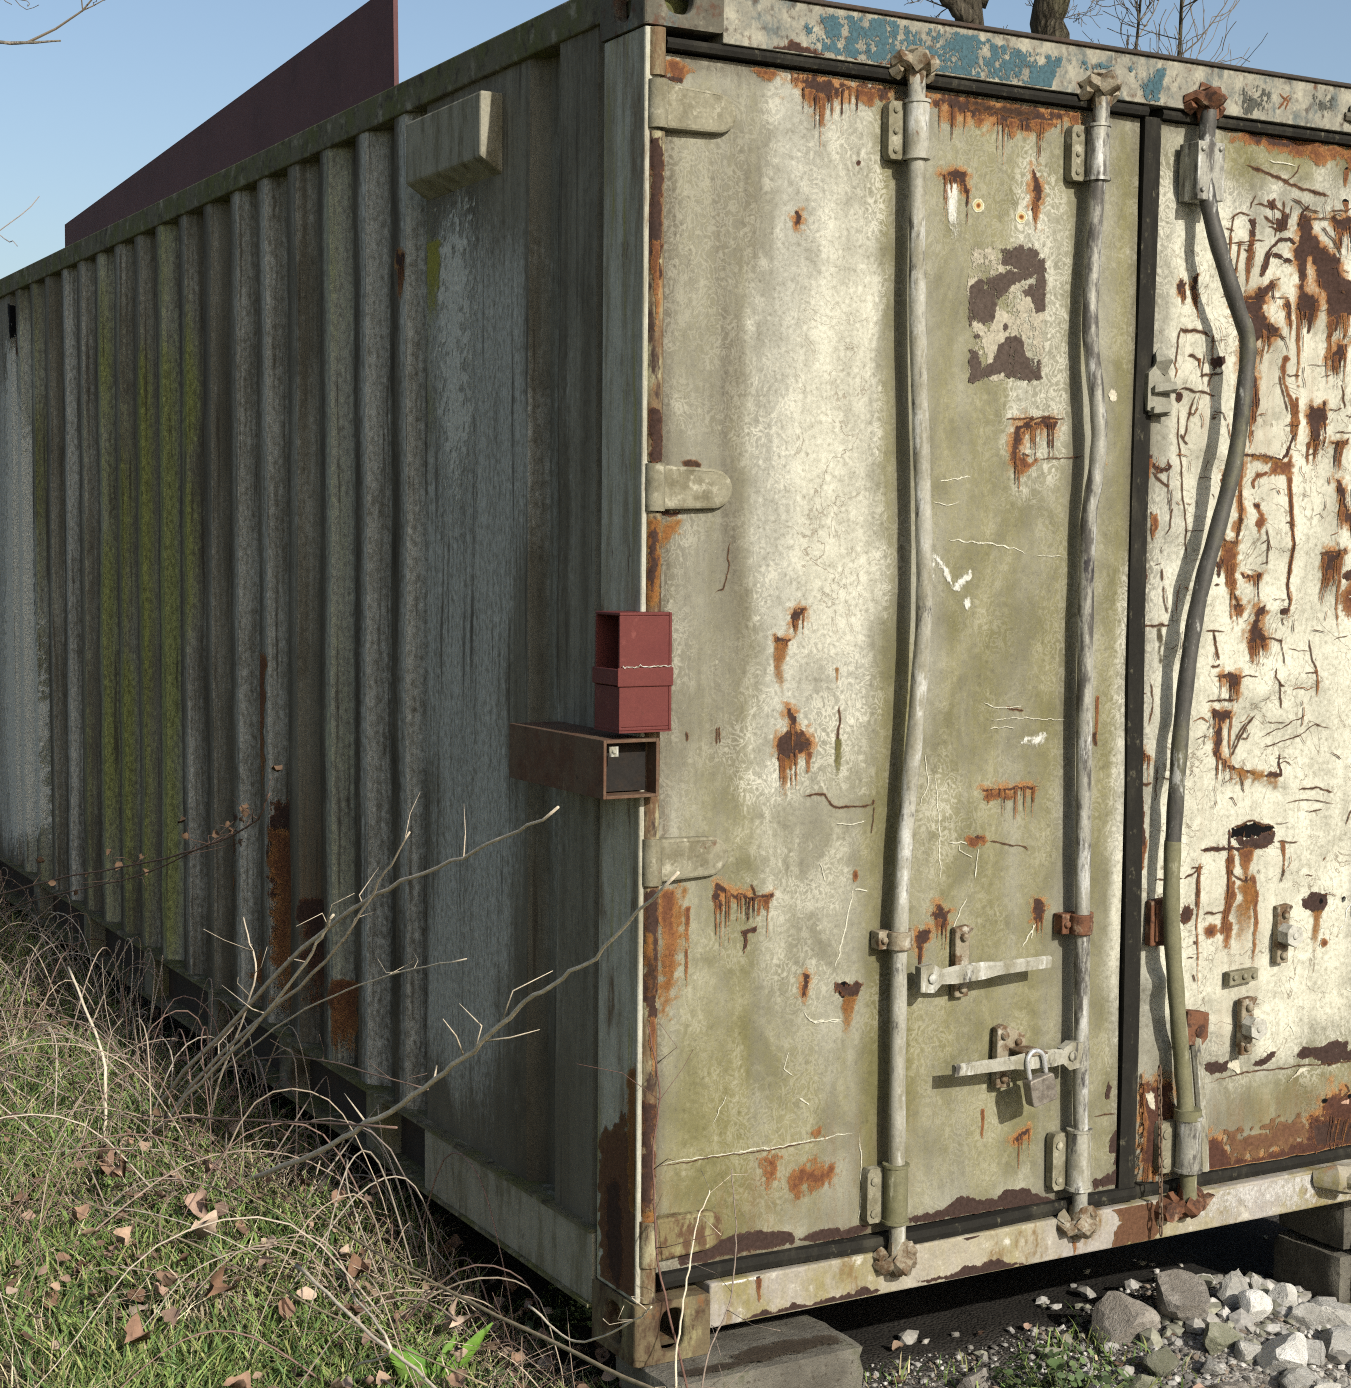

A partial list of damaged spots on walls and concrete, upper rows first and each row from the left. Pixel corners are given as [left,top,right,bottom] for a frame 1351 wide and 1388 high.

corrosion [752,68,904,148]
peeling [804,13,1167,102]
peeling [967,243,1048,384]
corrosion [1007,414,1083,489]
corrosion [1208,196,1351,793]
corrosion [773,604,808,683]
corrosion [773,701,817,789]
corrosion [248,799,359,1054]
corrosion [643,883,691,1074]
corrosion [1188,828,1286,982]
corrosion [597,1064,657,1297]
corrosion [1208,1076,1351,1170]